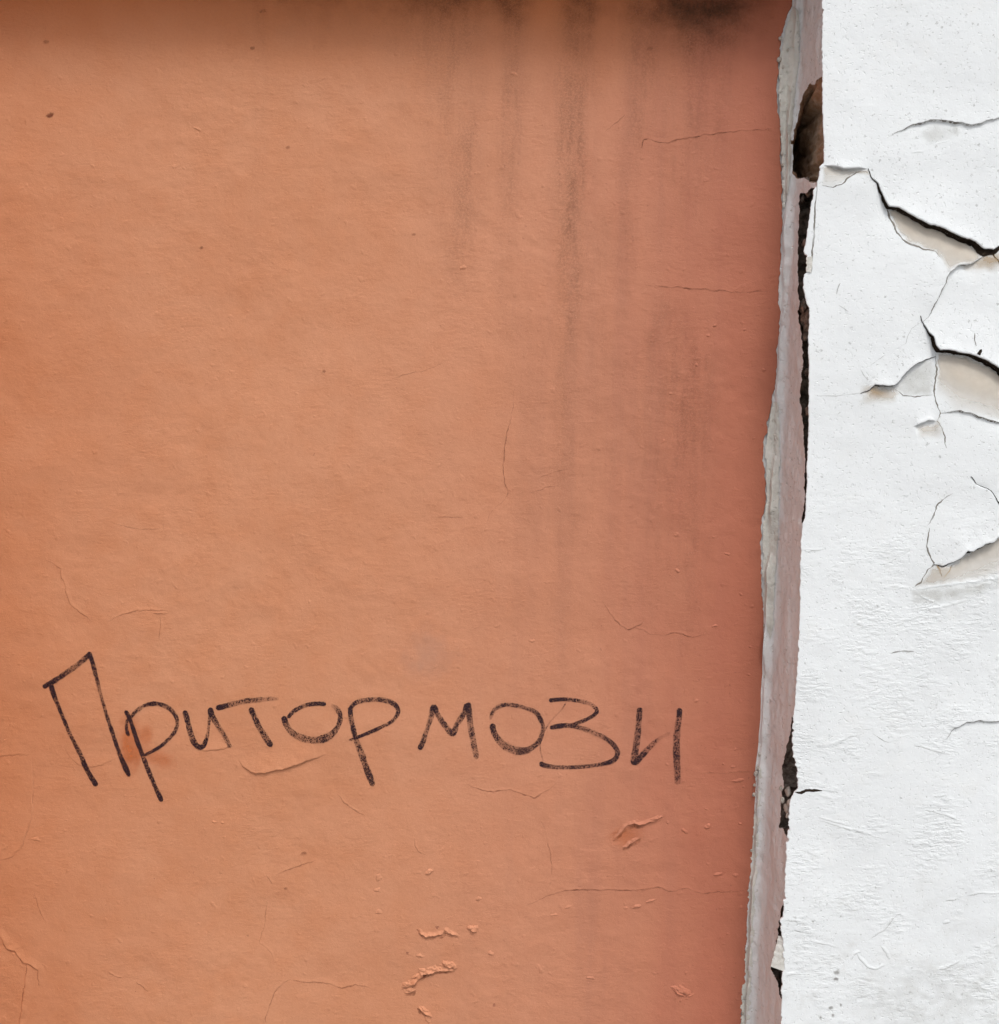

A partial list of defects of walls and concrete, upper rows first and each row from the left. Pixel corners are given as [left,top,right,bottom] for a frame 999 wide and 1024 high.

crack [640,128,764,147]
peeling [778,7,999,264]
crack [797,177,816,523]
peeling [862,316,999,405]
peeling [888,493,999,611]
crack [539,884,732,899]
spalling [401,960,457,994]